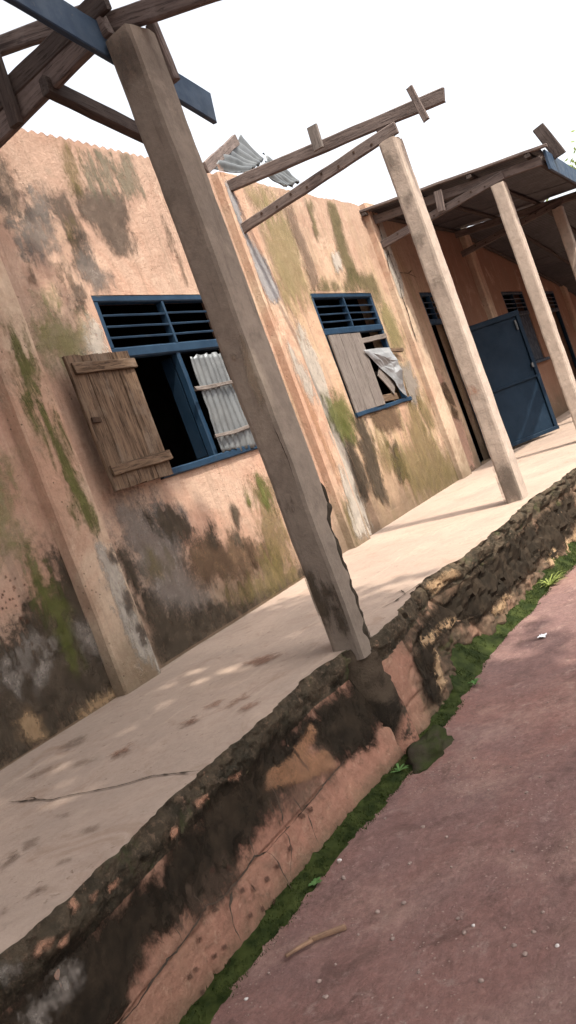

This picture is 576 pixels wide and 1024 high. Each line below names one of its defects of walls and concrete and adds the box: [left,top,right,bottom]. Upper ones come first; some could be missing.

water stain [0,150,145,315]
water stain [286,201,319,290]
water stain [26,401,100,537]
water stain [345,407,406,504]
water stain [108,491,348,662]
spalling [320,482,370,639]
water stain [0,546,113,769]
crack [9,770,200,802]
water stain [0,681,382,1024]